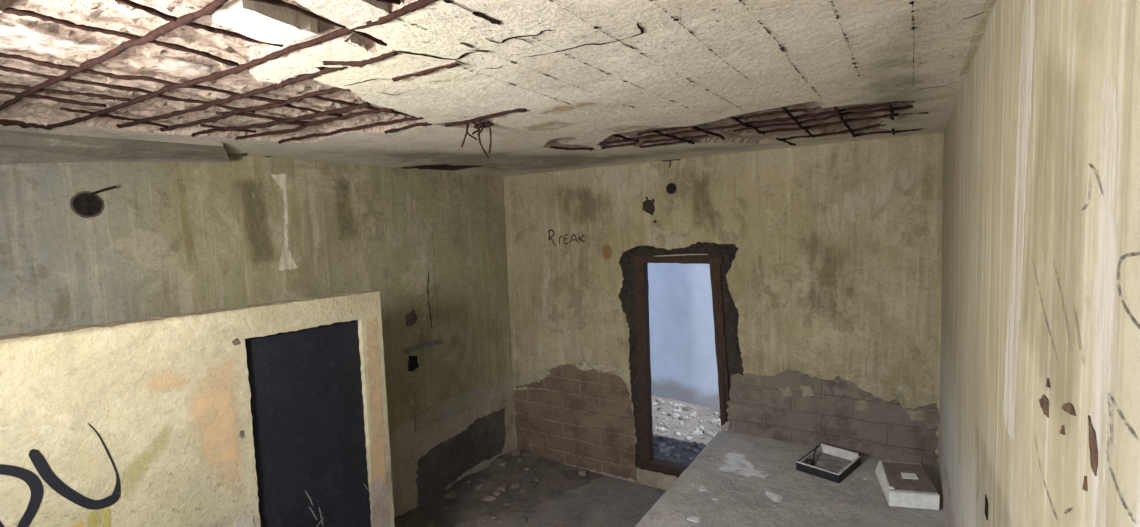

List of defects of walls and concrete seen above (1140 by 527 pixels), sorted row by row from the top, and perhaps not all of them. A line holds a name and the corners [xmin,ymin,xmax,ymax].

spalling [0,0,530,171]
spalling [543,101,929,151]
peeling [367,323,390,527]
spalling [408,355,419,371]
peeling [416,242,956,527]
spalling [1039,378,1098,491]